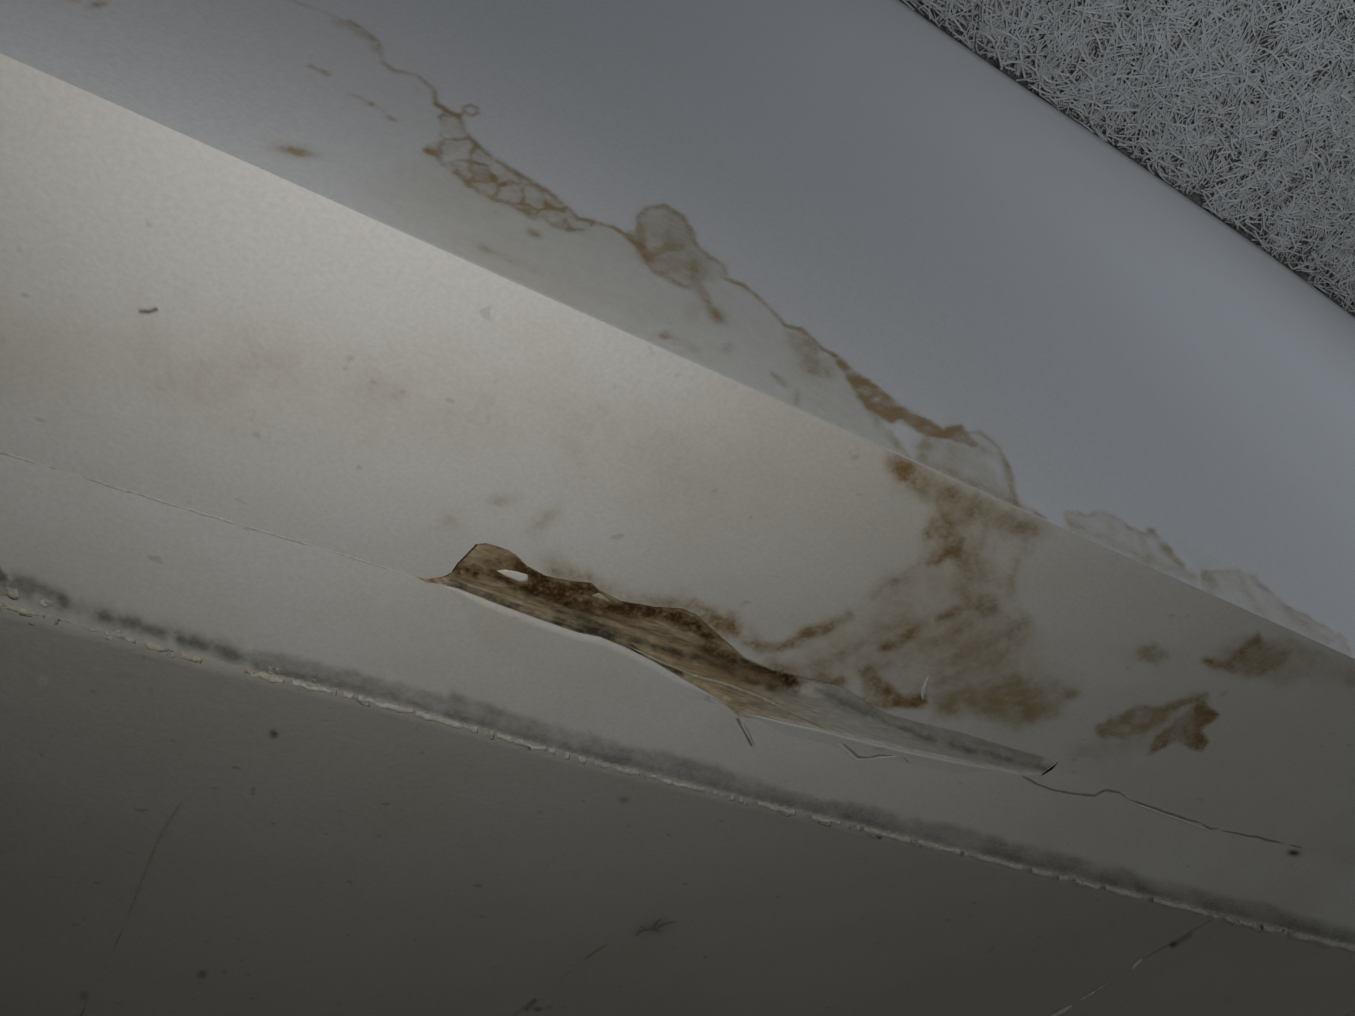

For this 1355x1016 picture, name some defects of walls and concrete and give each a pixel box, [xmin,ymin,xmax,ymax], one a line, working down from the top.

leakage [424,136,595,231]
leakage [611,226,698,285]
leakage [781,319,976,446]
flaking render [417,543,1058,776]
crack [1023,776,1304,849]